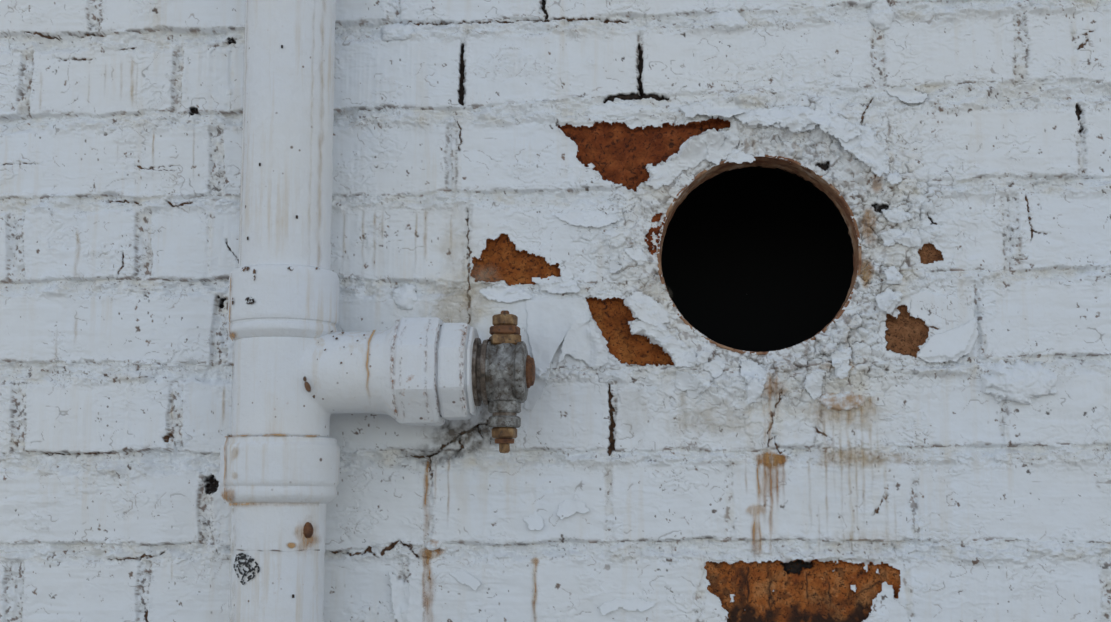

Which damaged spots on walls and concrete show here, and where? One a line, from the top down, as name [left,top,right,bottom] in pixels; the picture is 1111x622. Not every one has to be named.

spalling [470,98,902,411]
peeling [871,203,944,264]
peeling [875,266,978,363]
crack [411,420,488,477]
corrosion [757,452,786,499]
crack [331,541,419,558]
spalling [704,559,901,622]